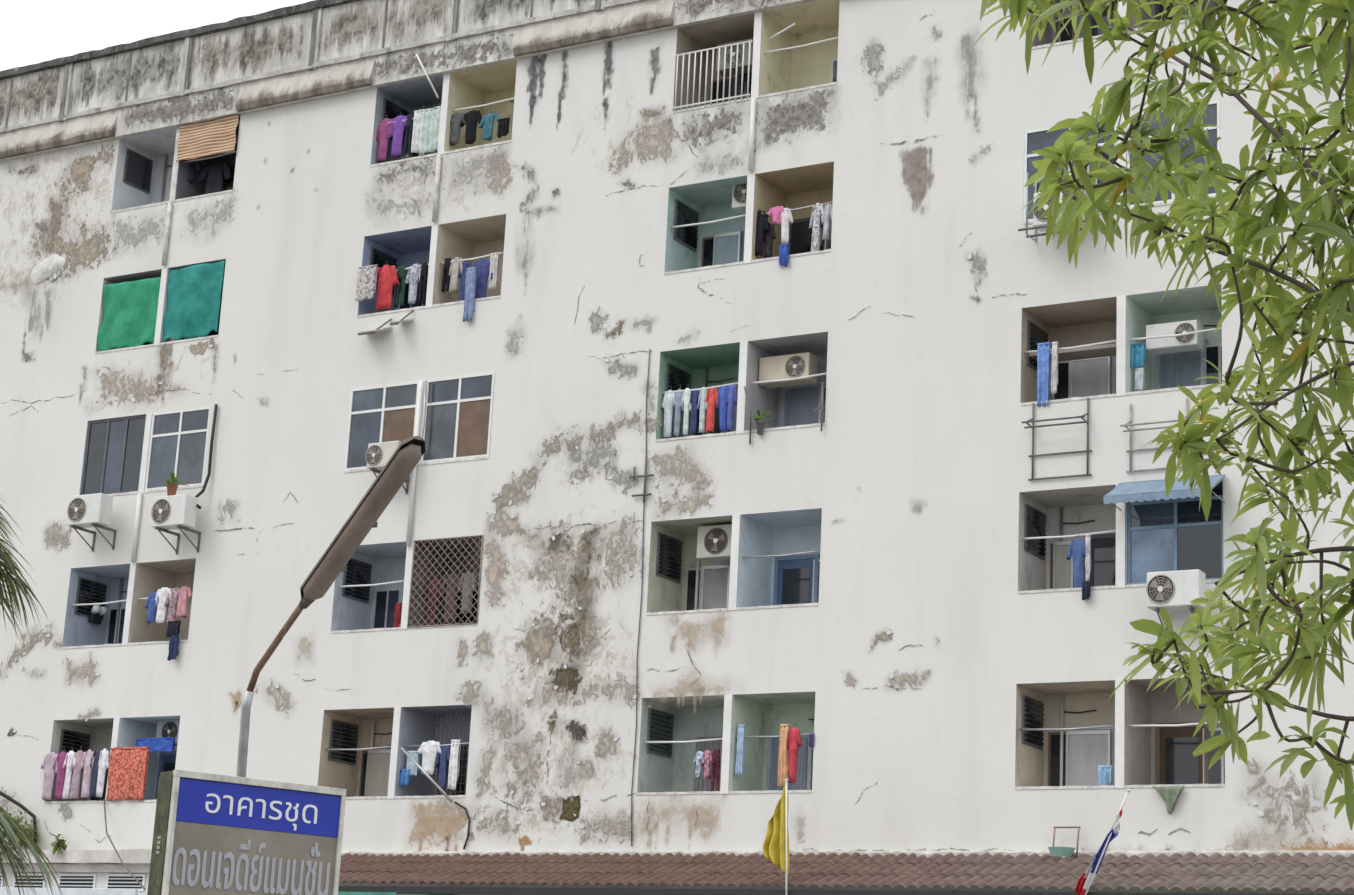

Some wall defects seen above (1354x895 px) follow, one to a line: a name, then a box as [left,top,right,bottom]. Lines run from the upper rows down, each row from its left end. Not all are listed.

water stain [0,22,303,130]
water stain [320,0,531,79]
water stain [526,51,567,124]
water stain [602,41,613,118]
water stain [640,47,833,174]
water stain [962,35,990,162]
peeling [54,143,115,202]
peeling [28,223,115,278]
peeling [605,359,638,380]
peeling [0,630,100,687]
peeling [455,410,714,845]
peeling [1245,758,1328,846]